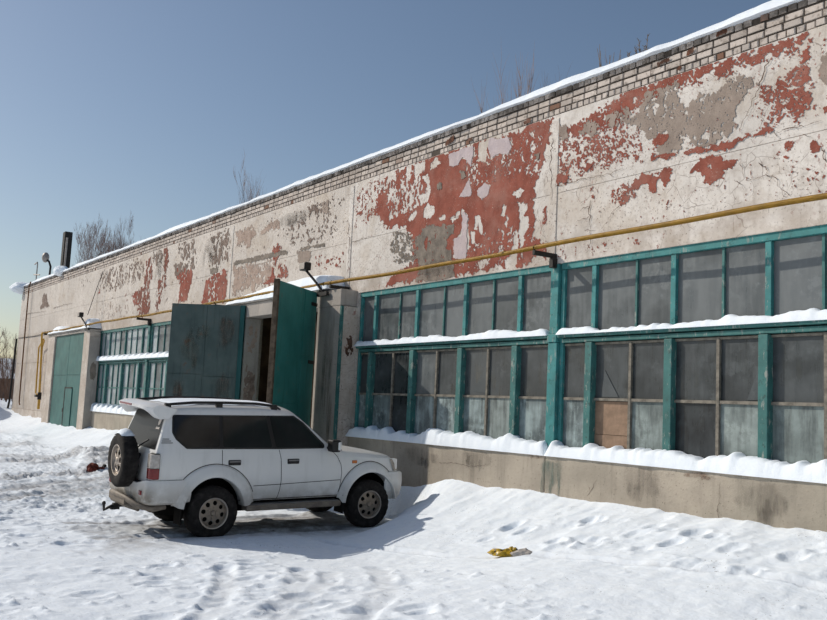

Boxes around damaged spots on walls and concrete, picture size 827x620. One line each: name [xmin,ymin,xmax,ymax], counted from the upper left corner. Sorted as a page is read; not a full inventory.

crack [549,138,620,252]
peeling [346,31,827,287]
crack [739,60,770,144]
crack [734,163,789,197]
spalling [83,196,344,318]